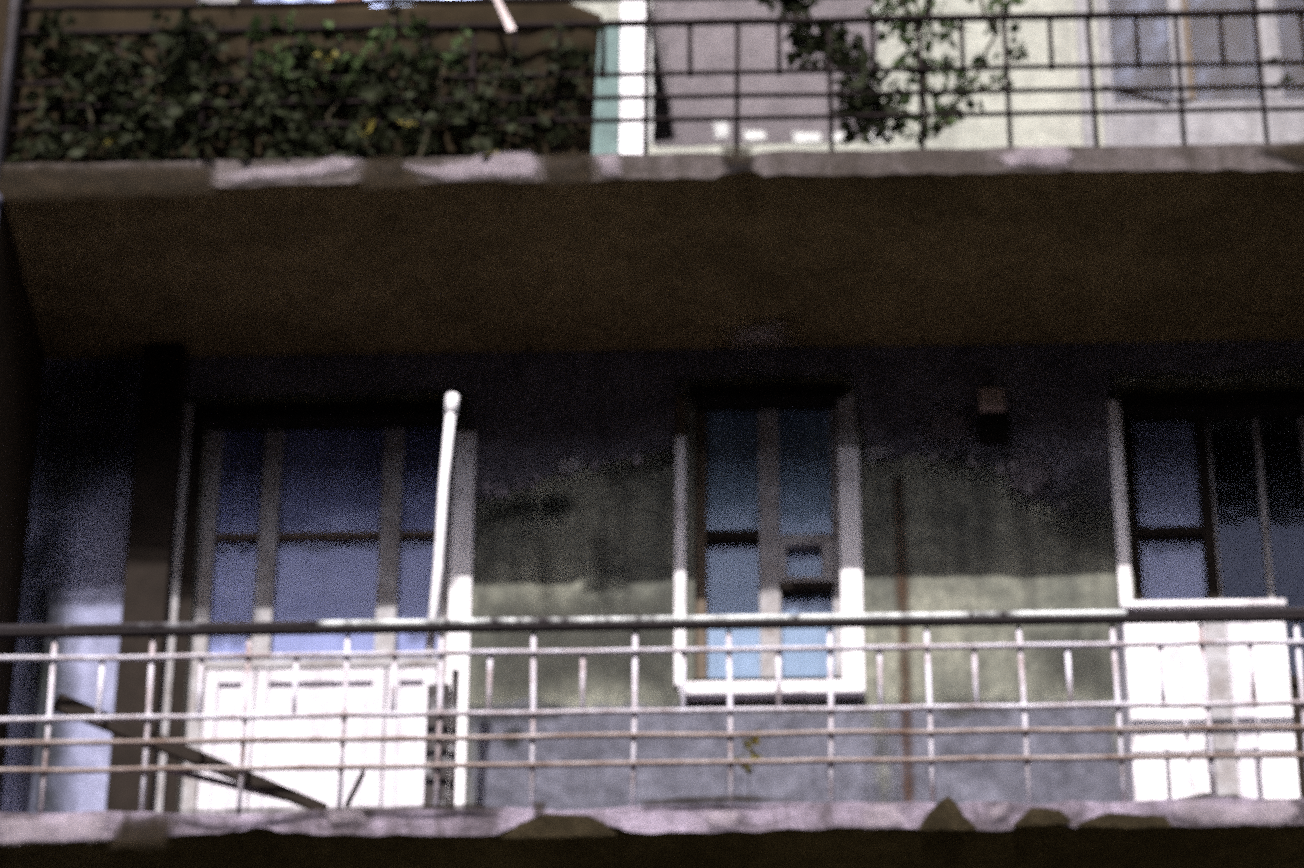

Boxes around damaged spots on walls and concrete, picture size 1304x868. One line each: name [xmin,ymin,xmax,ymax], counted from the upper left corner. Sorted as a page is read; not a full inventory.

peeling [650,0,890,164]
peeling [469,700,1295,838]